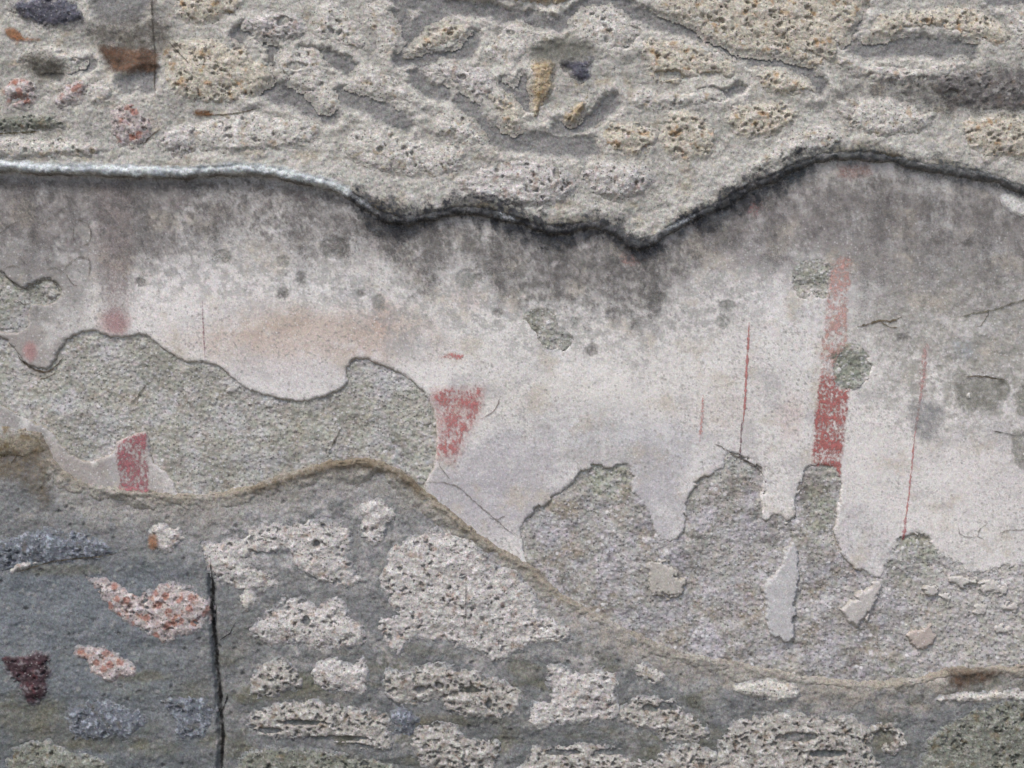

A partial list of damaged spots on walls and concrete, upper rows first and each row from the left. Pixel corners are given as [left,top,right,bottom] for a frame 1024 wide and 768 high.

water stain [0,144,1024,326]
spalling [0,272,437,495]
spalling [830,343,872,392]
peeling [954,378,1024,416]
crack [209,561,234,768]
spalling [520,452,1024,682]